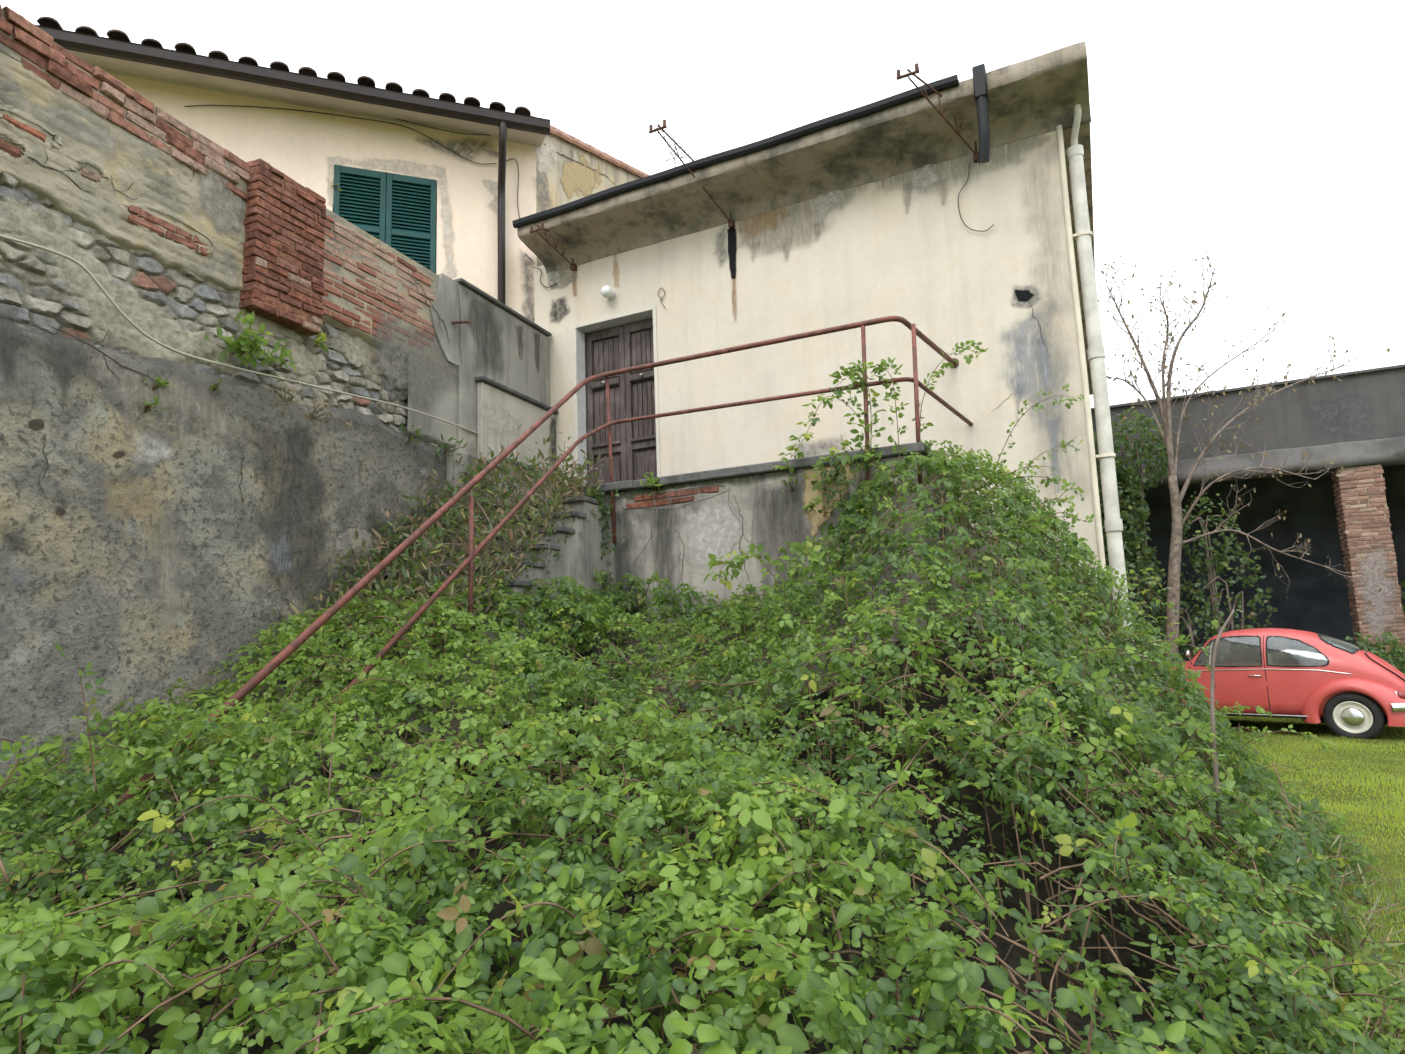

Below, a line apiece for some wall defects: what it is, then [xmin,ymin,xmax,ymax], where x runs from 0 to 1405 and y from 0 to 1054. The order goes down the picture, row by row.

flaking render [0,105,110,190]
peeling [536,137,601,199]
water stain [881,135,1044,209]
flaking render [119,202,218,256]
water stain [739,185,860,259]
spalling [1013,287,1039,307]
water stain [1007,305,1060,480]
flaking render [621,484,731,511]